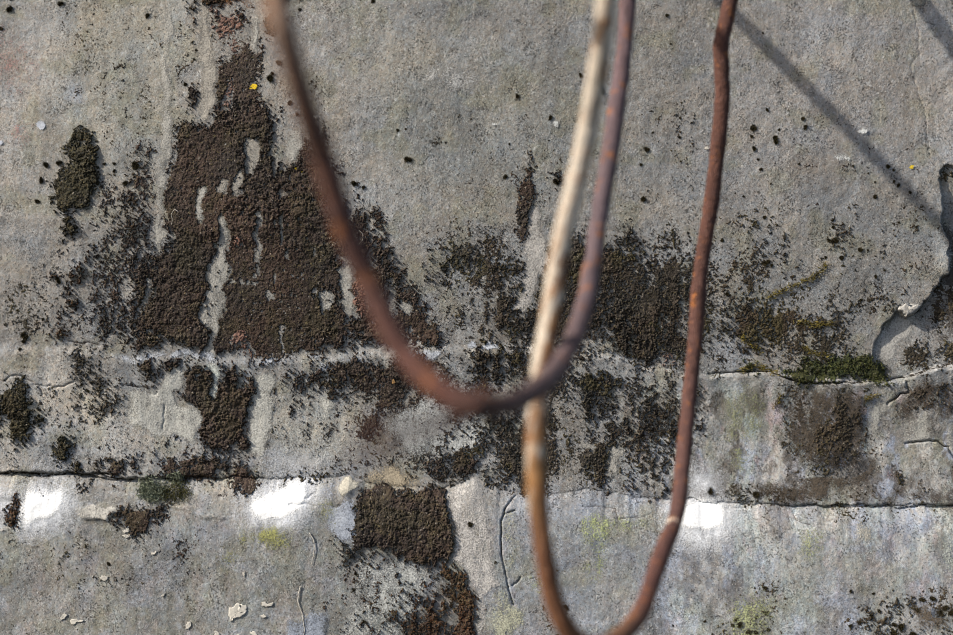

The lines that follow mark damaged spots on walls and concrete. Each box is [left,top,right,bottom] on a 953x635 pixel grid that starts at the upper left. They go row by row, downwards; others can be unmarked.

leakage [196,6,218,129]
leakage [153,10,175,254]
leakage [195,138,262,222]
leakage [274,128,303,172]
leakage [115,209,262,444]
leakage [318,256,354,316]
leakage [513,207,549,315]
crack [1,471,137,479]
leakage [385,397,453,426]
leakage [401,418,489,458]
leakage [715,379,953,506]
leakage [449,473,502,635]